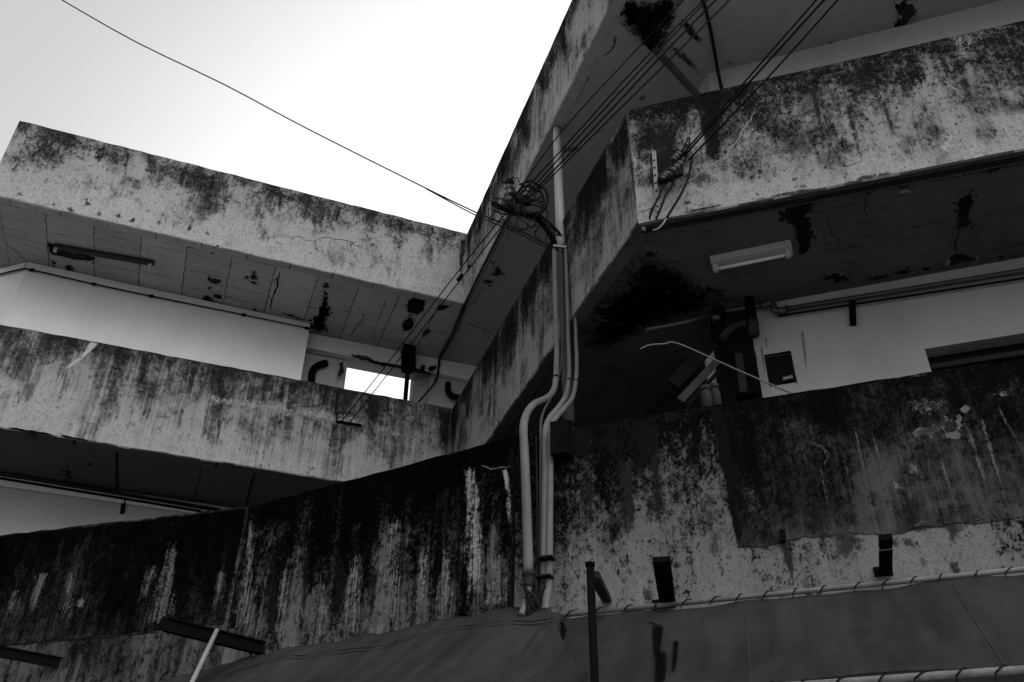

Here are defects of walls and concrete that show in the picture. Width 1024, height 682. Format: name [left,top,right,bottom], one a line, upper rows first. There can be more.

water stain [555,18,577,80]
water stain [517,66,549,138]
water stain [579,94,725,217]
water stain [267,189,341,224]
spalling [777,203,817,255]
spalling [952,190,978,236]
peeling [200,276,224,304]
crack [270,272,280,311]
spalling [283,282,333,333]
water stain [302,446,515,636]
water stain [142,548,176,623]
water stain [236,523,254,632]